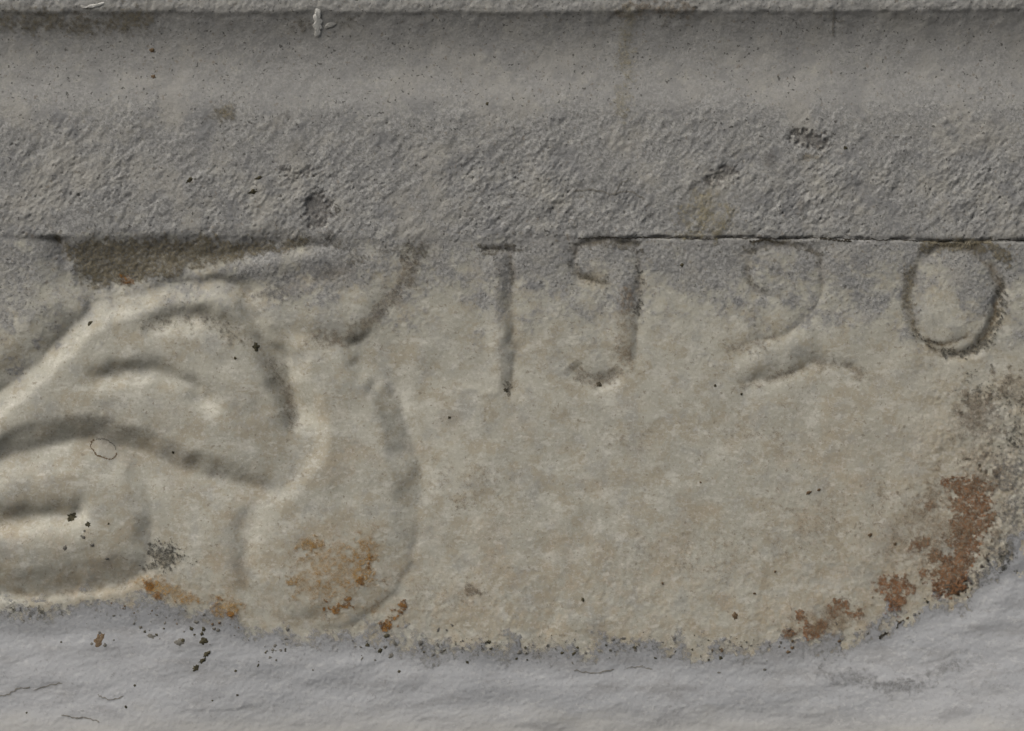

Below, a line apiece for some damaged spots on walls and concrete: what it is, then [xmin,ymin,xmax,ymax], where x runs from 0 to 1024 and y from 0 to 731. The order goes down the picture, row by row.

crack [578,236,1024,246]
corrosion [286,539,378,614]
corrosion [782,464,1002,641]